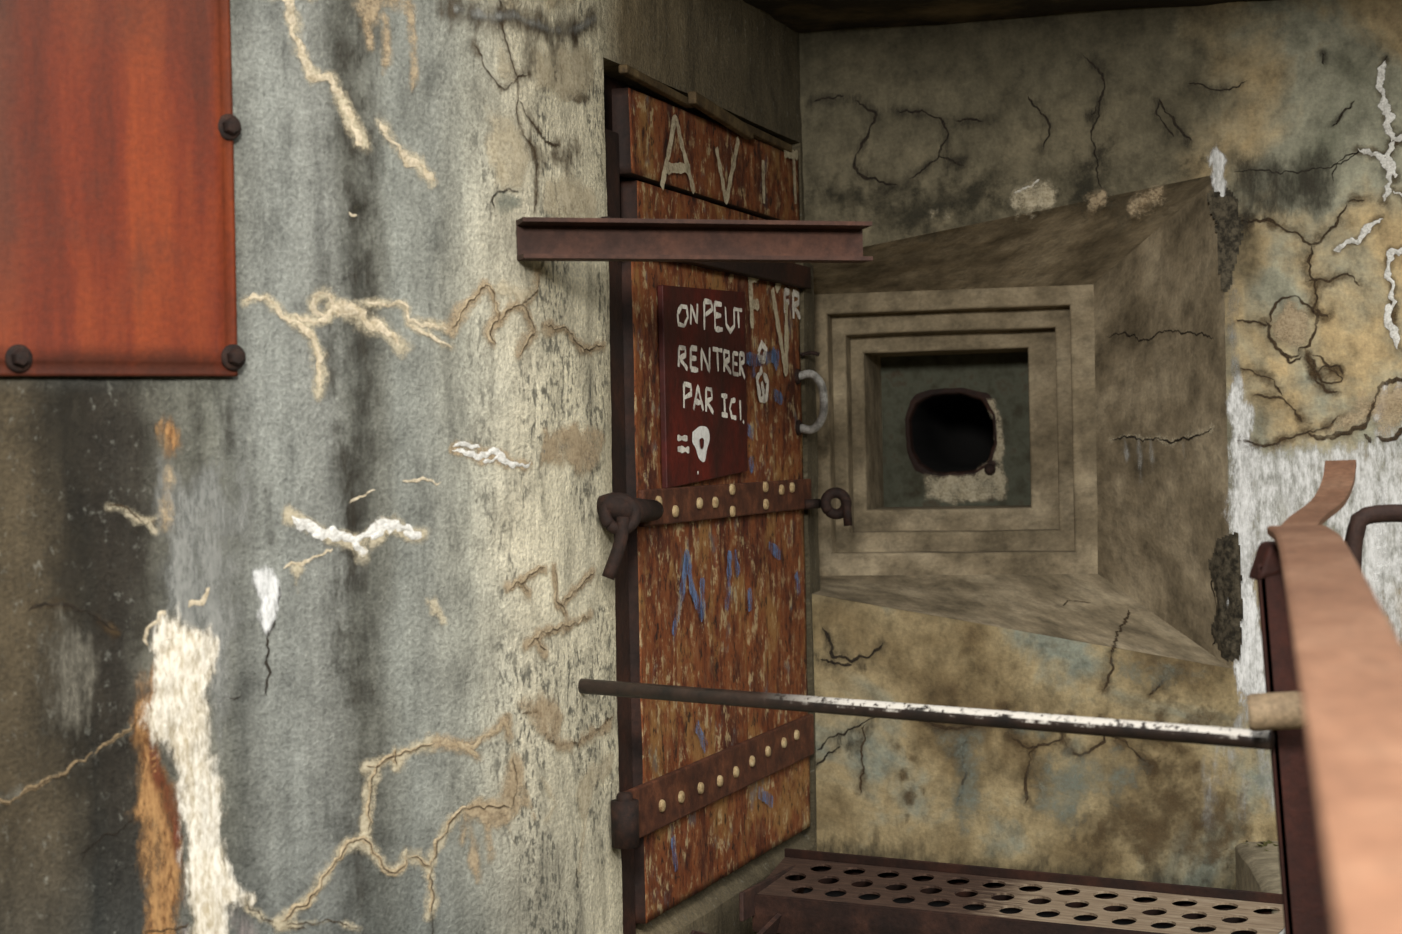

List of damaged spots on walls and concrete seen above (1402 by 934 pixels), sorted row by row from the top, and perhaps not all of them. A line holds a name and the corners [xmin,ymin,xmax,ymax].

crack [810,95,981,185]
crack [1028,96,1051,149]
crack [1082,54,1105,189]
crack [1189,82,1244,91]
crack [1109,99,1365,447]
crack [0,716,139,805]
rust [135,665,189,934]
damp [136,471,256,934]
crack [244,745,518,934]
crack [817,717,874,793]
crack [820,628,883,666]
crack [923,608,1155,803]